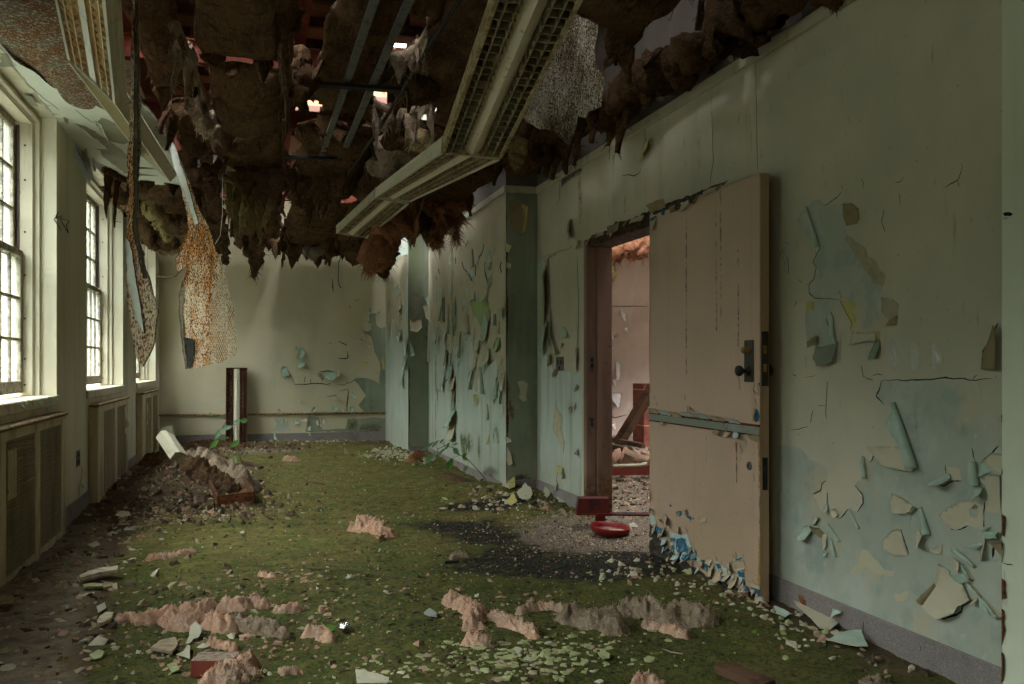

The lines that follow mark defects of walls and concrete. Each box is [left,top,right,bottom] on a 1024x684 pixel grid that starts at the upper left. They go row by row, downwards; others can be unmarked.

peeling [843,203,860,226]
peeling [245,180,728,520]
crack [861,366,990,381]
peeling [981,323,998,370]
peeling [553,380,1005,684]
peeling [355,628,672,684]